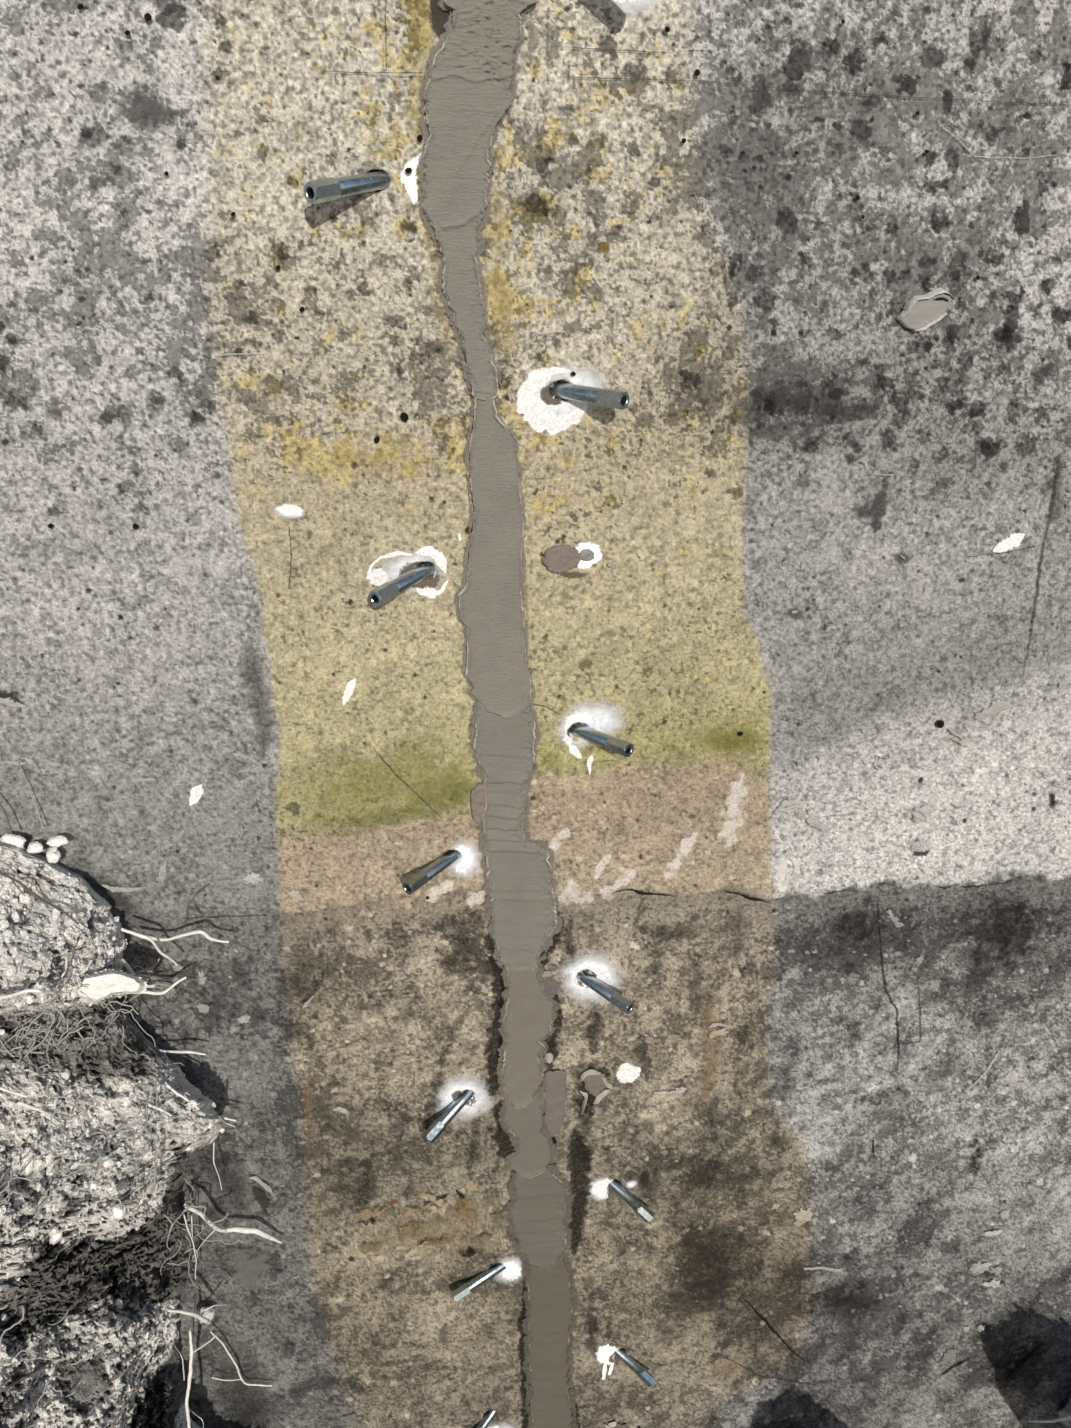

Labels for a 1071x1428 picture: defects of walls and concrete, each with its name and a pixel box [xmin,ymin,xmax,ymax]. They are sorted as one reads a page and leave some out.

crack [320,0,1071,1428]
leakage [957,897,1066,965]